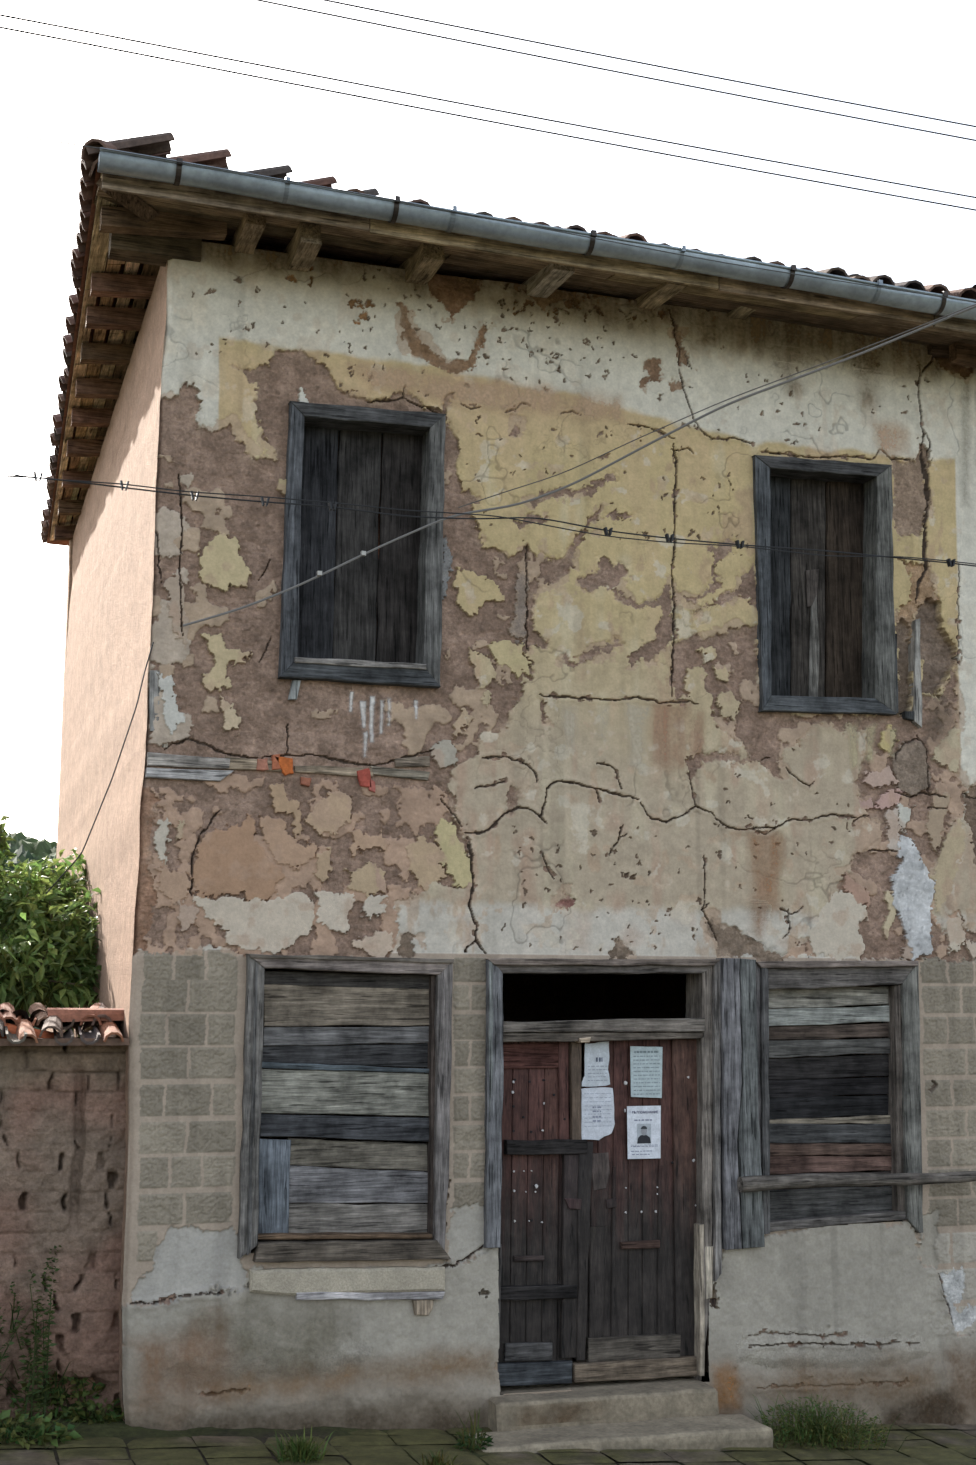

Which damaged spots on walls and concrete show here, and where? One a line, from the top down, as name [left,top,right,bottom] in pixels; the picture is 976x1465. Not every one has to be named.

crack [539,308,963,706]
crack [524,544,532,654]
flaking render [132,265,976,963]
crack [164,723,435,766]
crack [189,809,222,896]
crack [440,734,976,953]
flaking render [940,1266,976,1331]